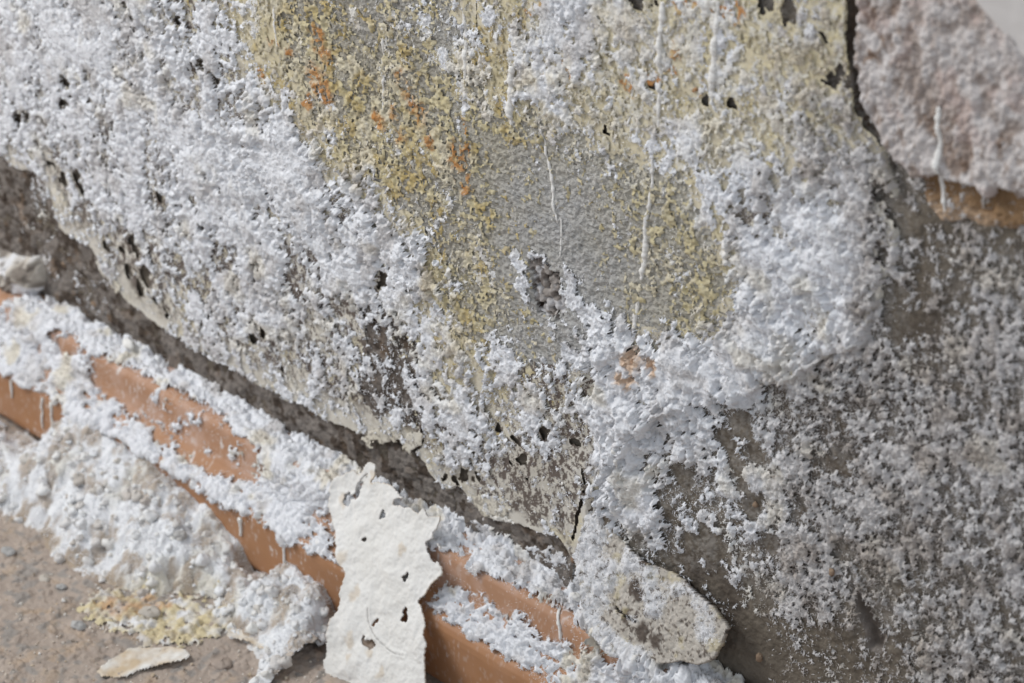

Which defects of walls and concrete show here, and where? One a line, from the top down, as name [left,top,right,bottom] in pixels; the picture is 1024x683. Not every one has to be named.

crack [846,0,899,169]
water stain [906,175,938,205]
flaking render [922,175,1024,229]
peeling [0,0,902,587]
water stain [0,267,368,568]
water stain [76,576,236,649]
water stain [372,475,745,683]